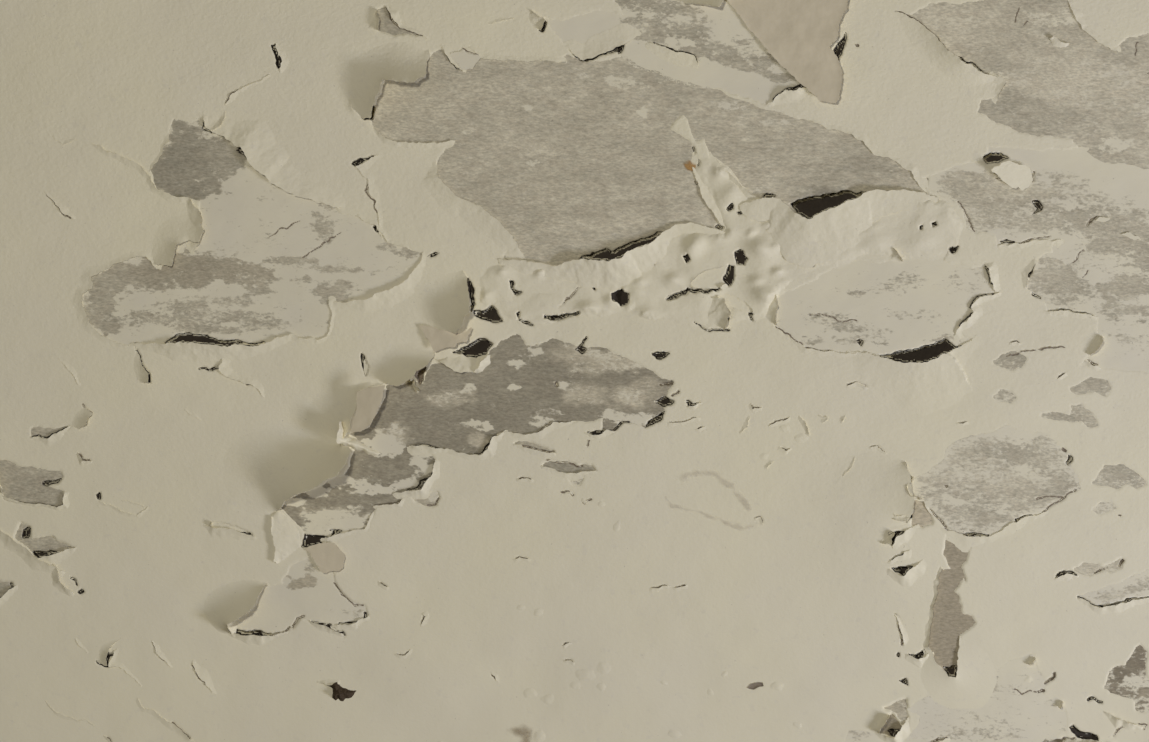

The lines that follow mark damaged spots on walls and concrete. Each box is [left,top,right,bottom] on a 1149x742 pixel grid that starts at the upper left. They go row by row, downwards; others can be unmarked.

peeling [73,111,430,369]
peeling [234,0,1149,637]
peeling [0,581,18,607]
peeling [0,460,70,511]
peeling [844,425,1149,742]